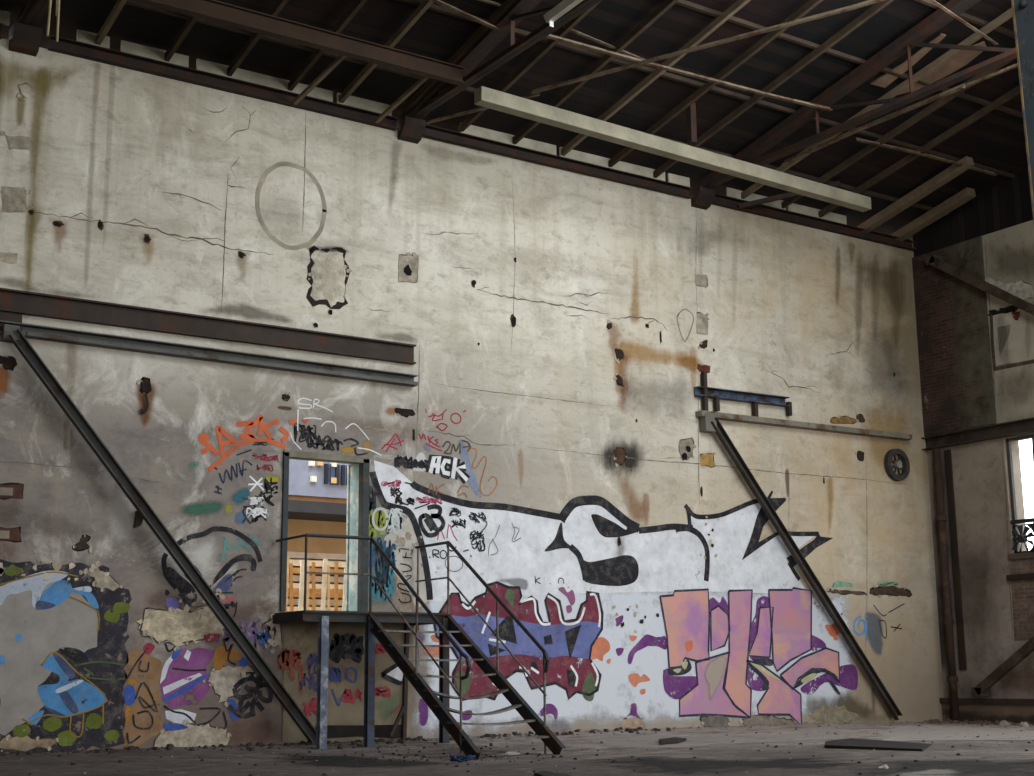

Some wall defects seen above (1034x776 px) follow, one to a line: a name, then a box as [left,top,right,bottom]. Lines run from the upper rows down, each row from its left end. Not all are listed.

damp [0,63,51,171]
crack [165,106,256,211]
crack [34,212,274,255]
spalling [306,246,352,315]
rust [138,384,154,424]
peeling [21,535,124,592]
peeling [136,588,236,651]
peeling [259,614,282,654]
peeling [202,665,258,707]
peeling [0,729,61,752]
peeling [153,719,232,748]